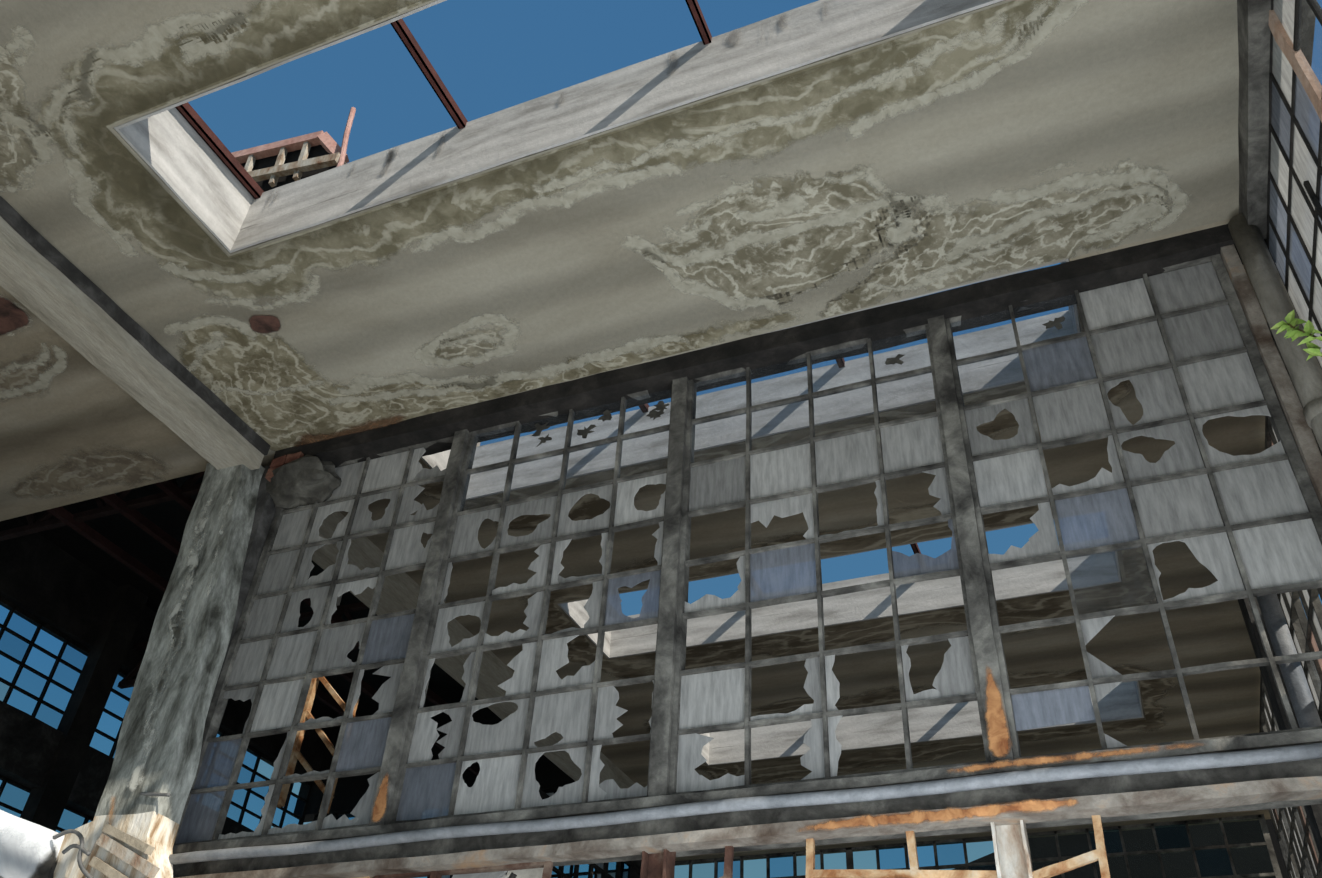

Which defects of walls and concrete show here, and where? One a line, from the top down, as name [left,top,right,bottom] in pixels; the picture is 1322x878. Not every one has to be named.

damp [0,0,1188,452]
damp [694,402,937,462]
damp [419,459,443,500]
damp [464,458,668,521]
damp [496,514,551,530]
corrosion [957,669,1192,772]
corrosion [808,799,1077,830]